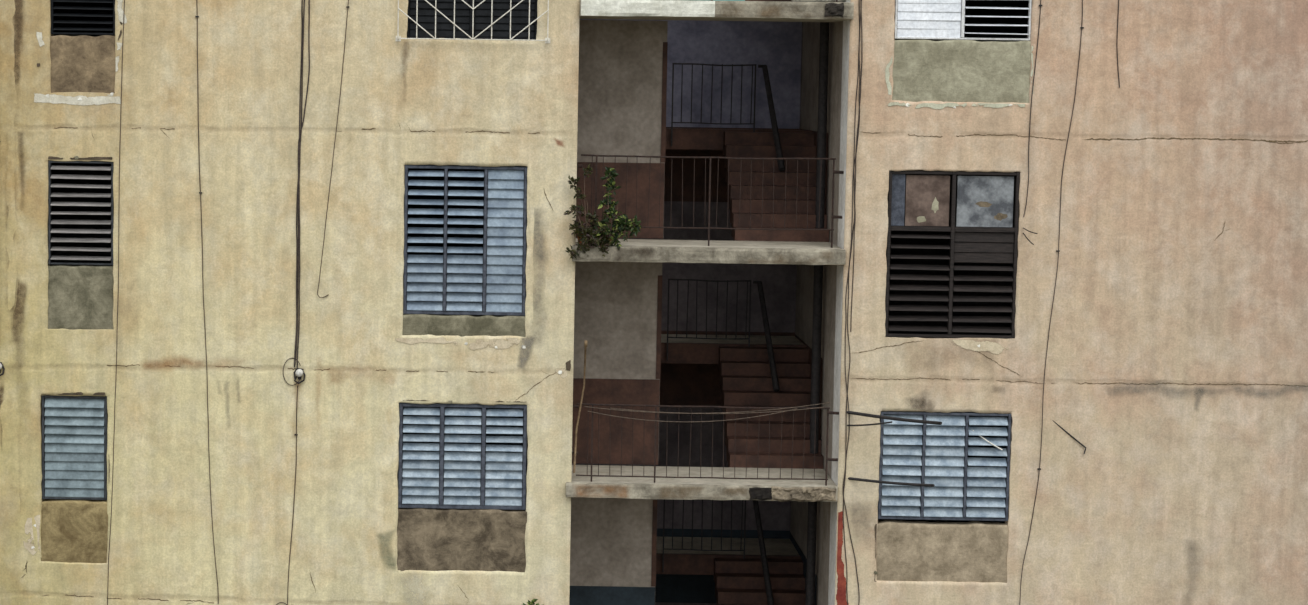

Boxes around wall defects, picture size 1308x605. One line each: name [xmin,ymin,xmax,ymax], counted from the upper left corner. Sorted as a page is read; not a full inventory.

peeling [116,0,127,72]
peeling [34,93,121,105]
crack [864,132,1308,144]
crack [850,340,1308,387]
spalling [749,486,836,502]